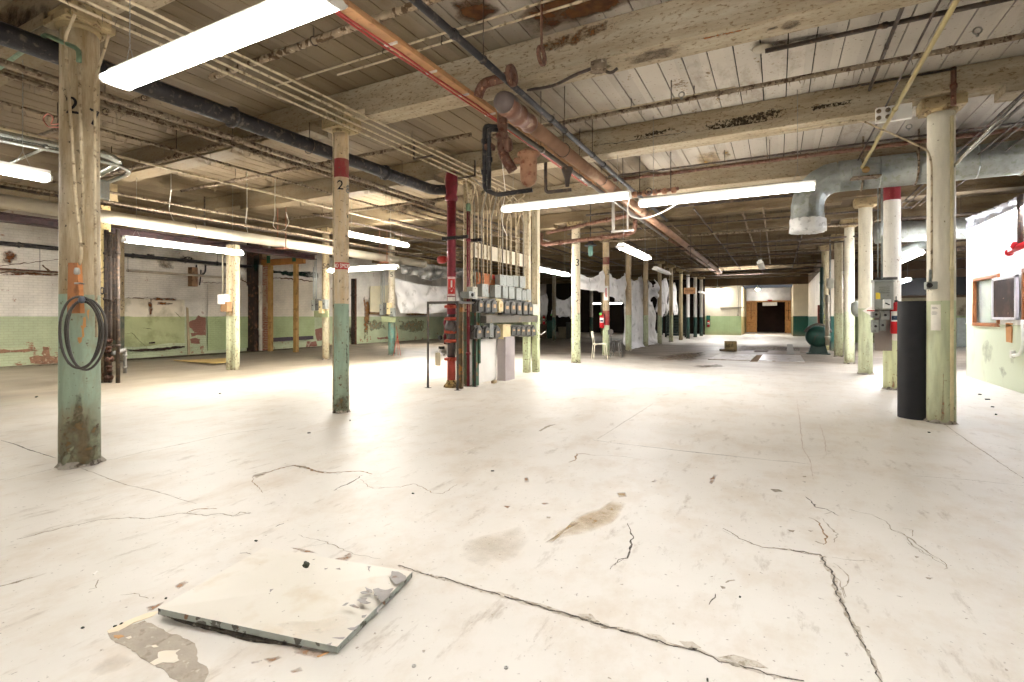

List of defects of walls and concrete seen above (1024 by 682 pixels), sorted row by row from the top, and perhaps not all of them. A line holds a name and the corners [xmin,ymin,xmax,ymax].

leakage [706,109,786,130]
leakage [811,100,854,111]
spalling [0,347,58,364]
flaking render [189,315,206,344]
crack [19,429,458,539]
crack [570,404,948,682]
crack [277,523,804,682]
peeling [107,611,302,682]